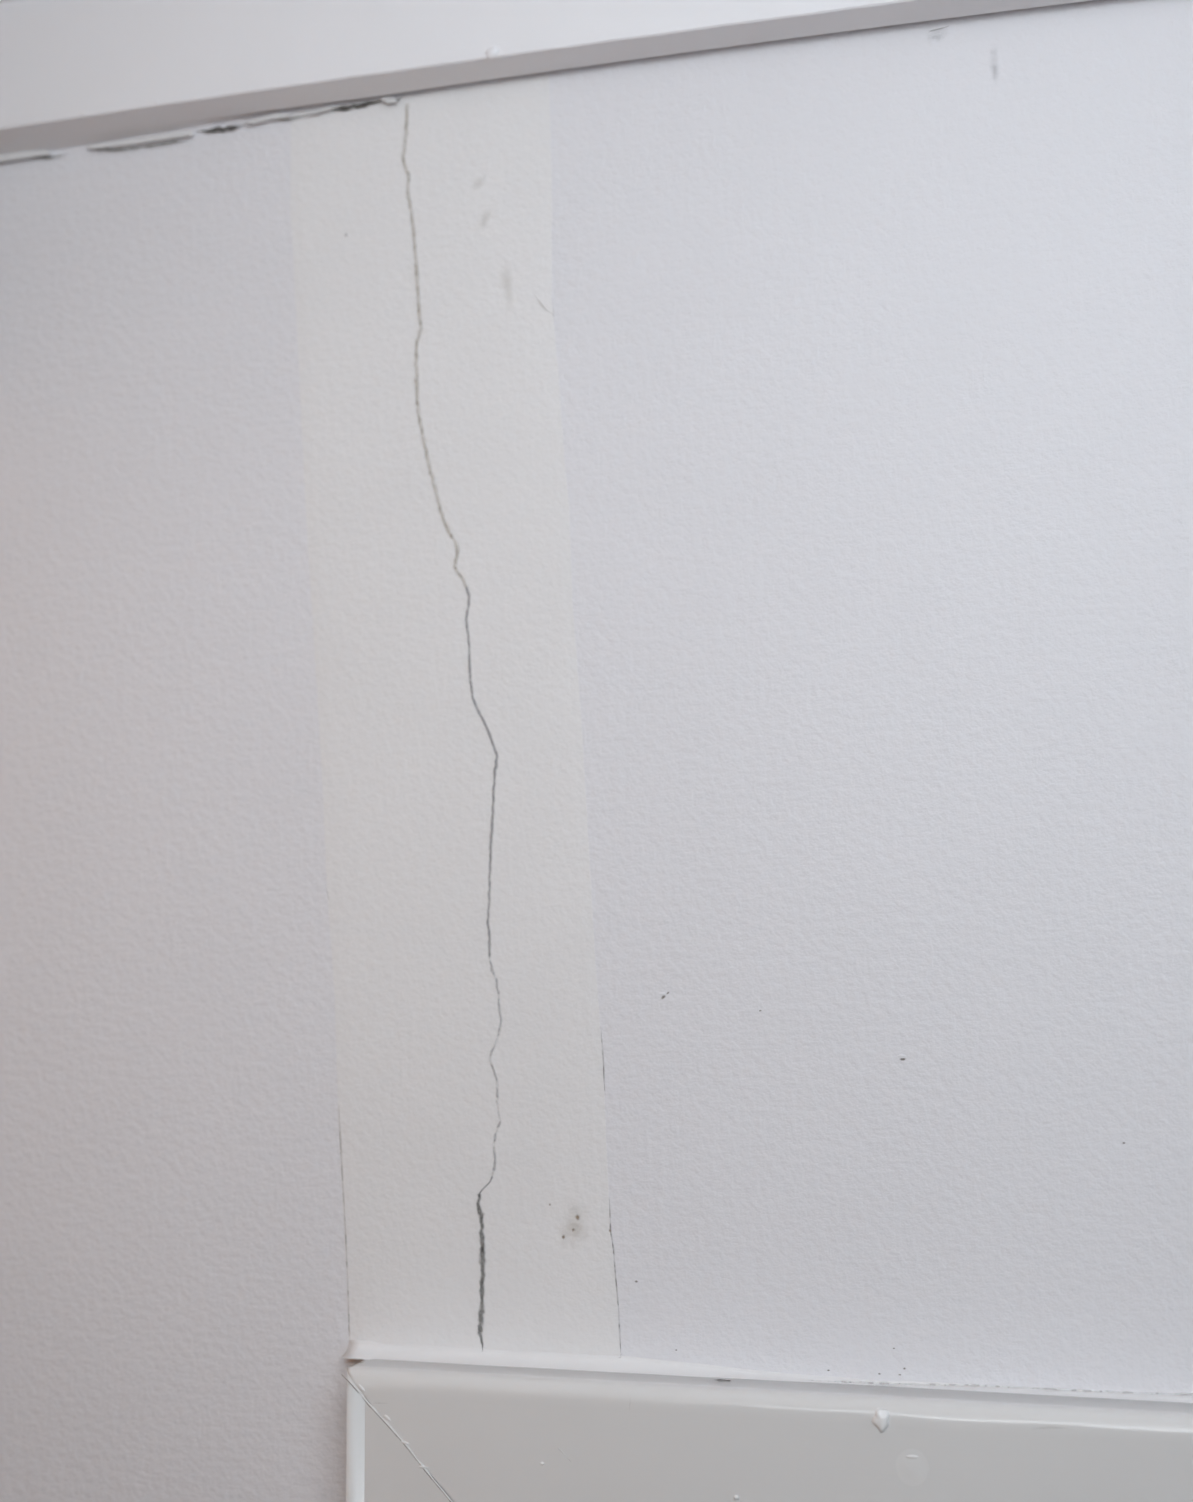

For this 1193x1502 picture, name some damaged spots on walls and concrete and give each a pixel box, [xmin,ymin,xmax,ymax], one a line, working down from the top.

crack [416,267,502,1351]